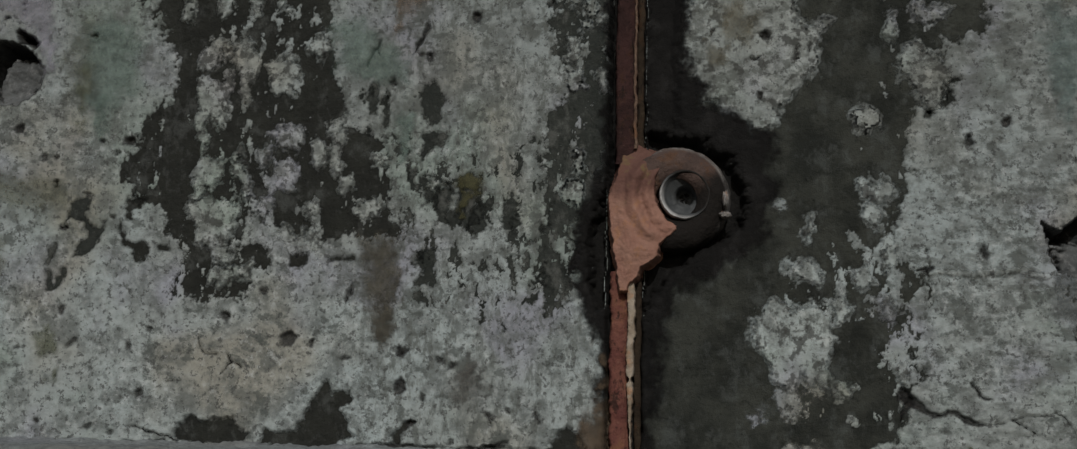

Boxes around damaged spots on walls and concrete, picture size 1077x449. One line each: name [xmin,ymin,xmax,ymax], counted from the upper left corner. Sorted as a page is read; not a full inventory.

spalling [0,31,46,106]
damp [360,234,401,344]
crack [917,266,934,277]
spalling [1040,217,1077,303]
peeling [175,415,248,443]
peeling [261,380,352,447]
crack [896,383,1076,434]